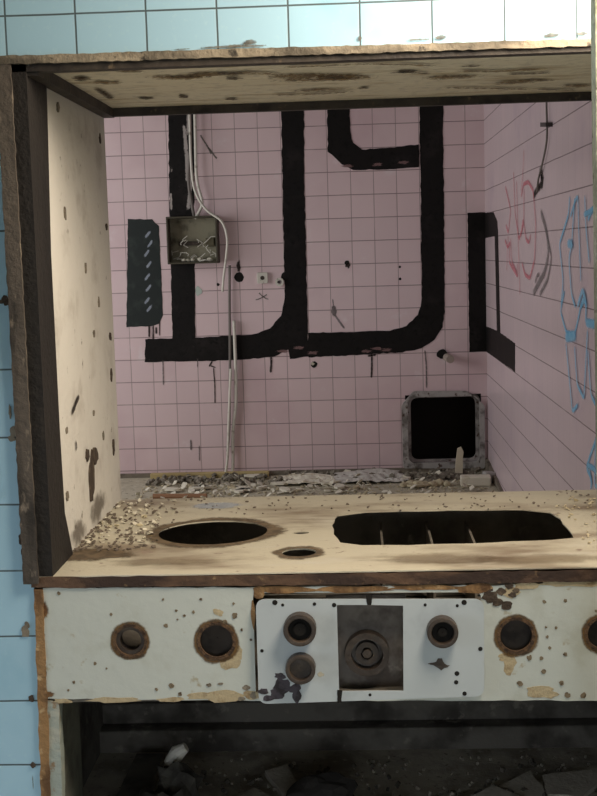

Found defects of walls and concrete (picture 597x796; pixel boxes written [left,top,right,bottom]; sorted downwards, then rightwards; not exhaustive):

peeling [250,582,597,641]
rust [111,622,150,660]
rust [194,619,239,664]
peeling [220,645,242,670]
rust [494,614,538,657]
peeling [155,673,302,704]